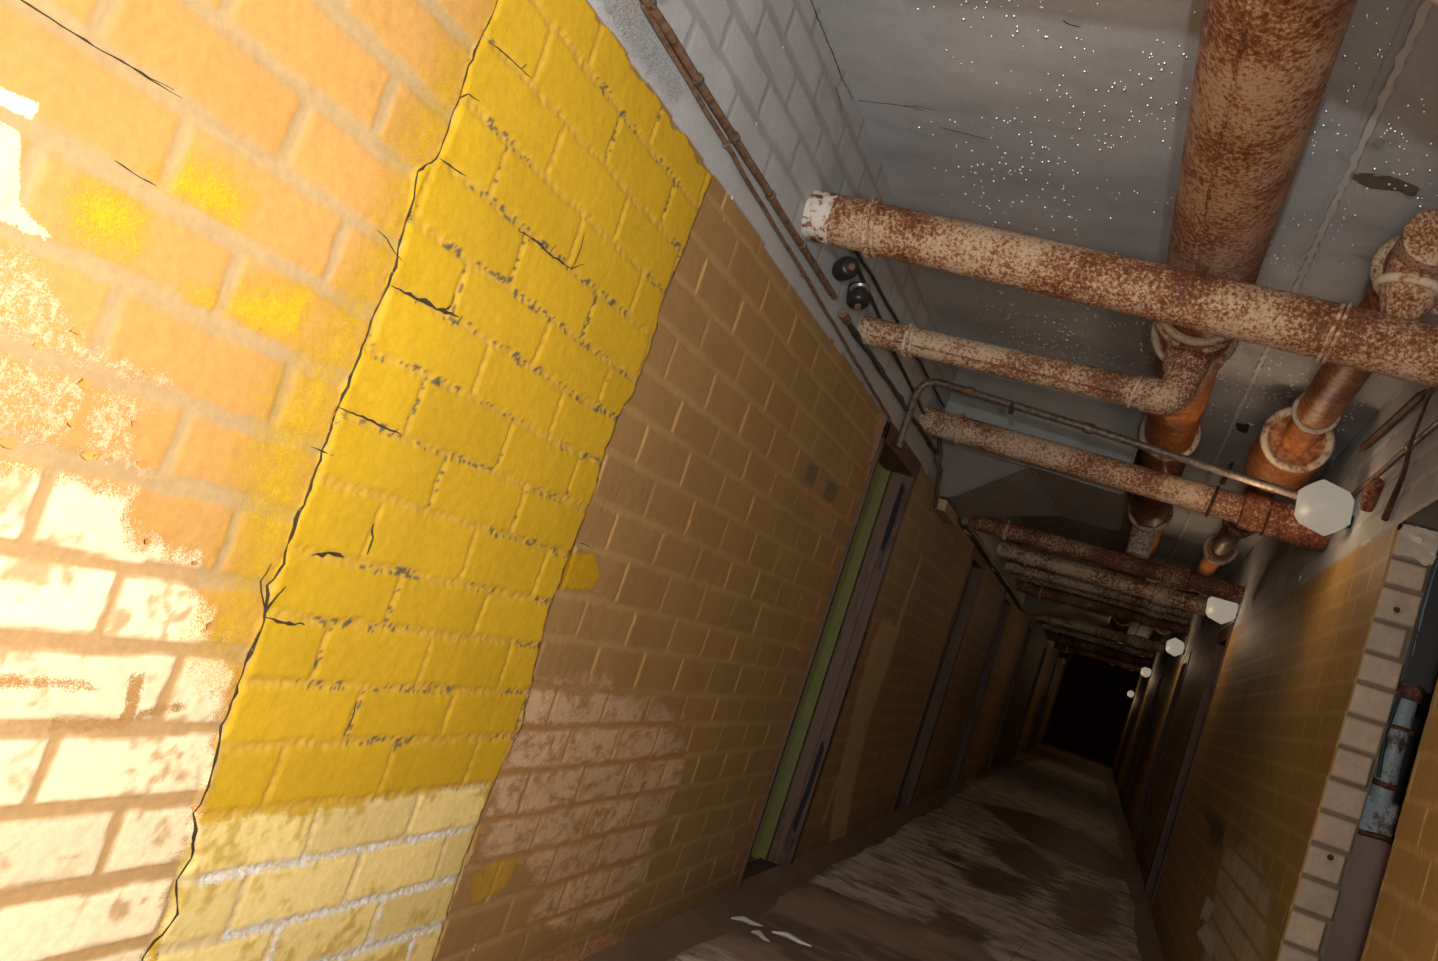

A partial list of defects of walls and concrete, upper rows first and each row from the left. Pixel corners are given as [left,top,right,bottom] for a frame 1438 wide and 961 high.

crack [21,0,182,98]
peeling [0,86,239,961]
crack [142,0,532,961]
crack [432,177,713,961]